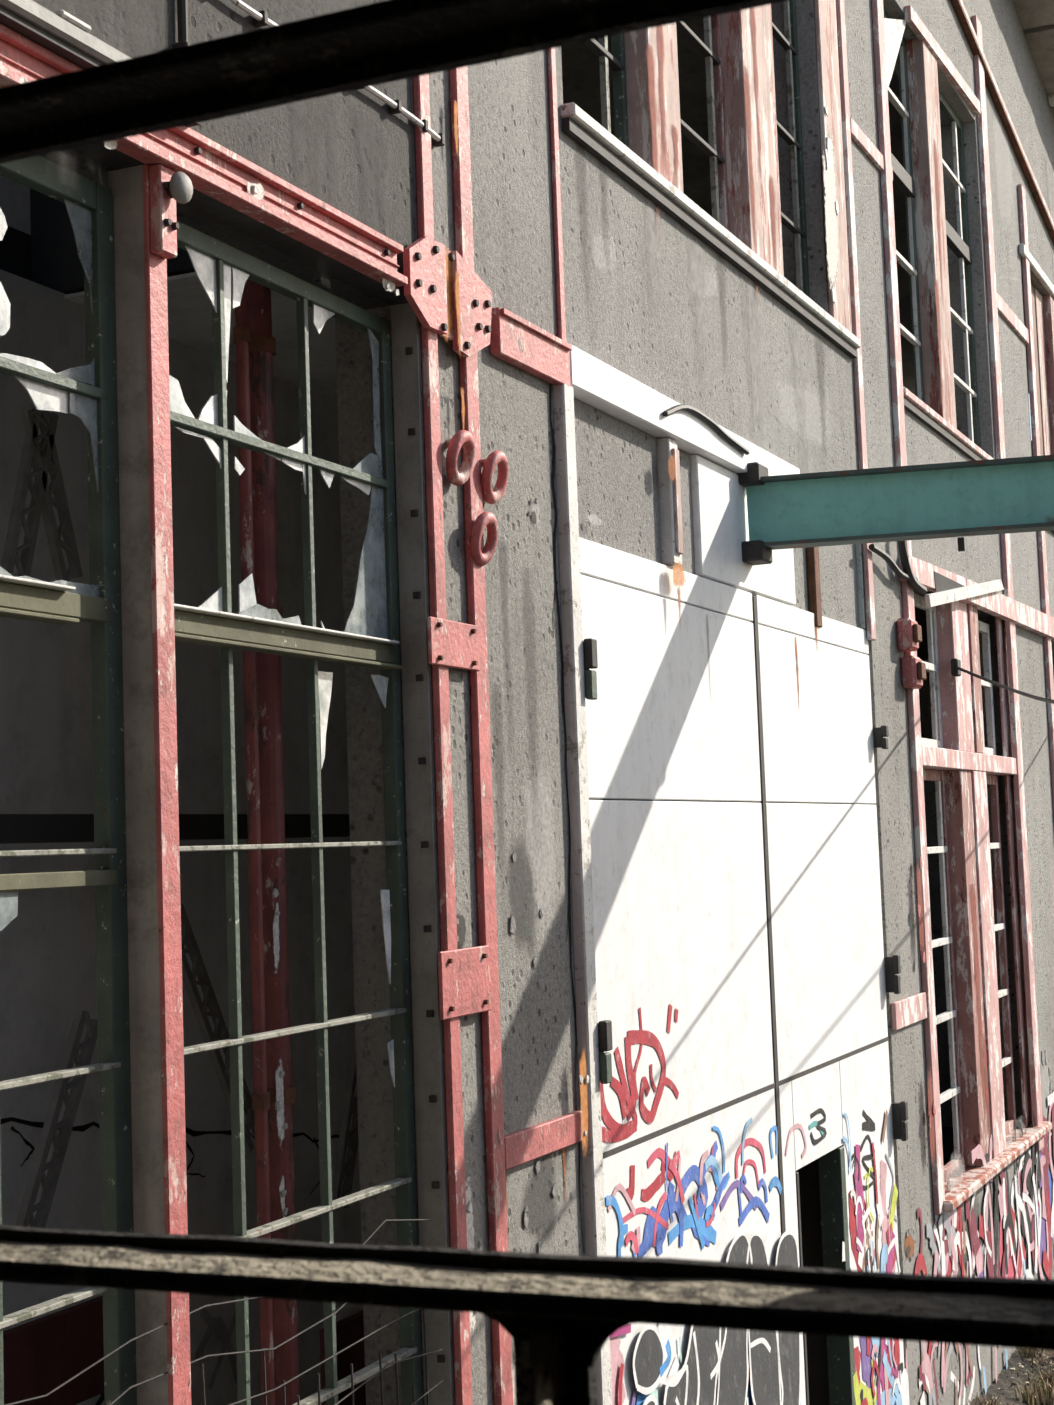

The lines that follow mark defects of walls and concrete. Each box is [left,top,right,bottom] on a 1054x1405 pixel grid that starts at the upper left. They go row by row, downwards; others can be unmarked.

peeling [822,106,839,303]
peeling [917,855,925,964]
peeling [928,1073,936,1159]
spalling [1042,1049,1052,1094]